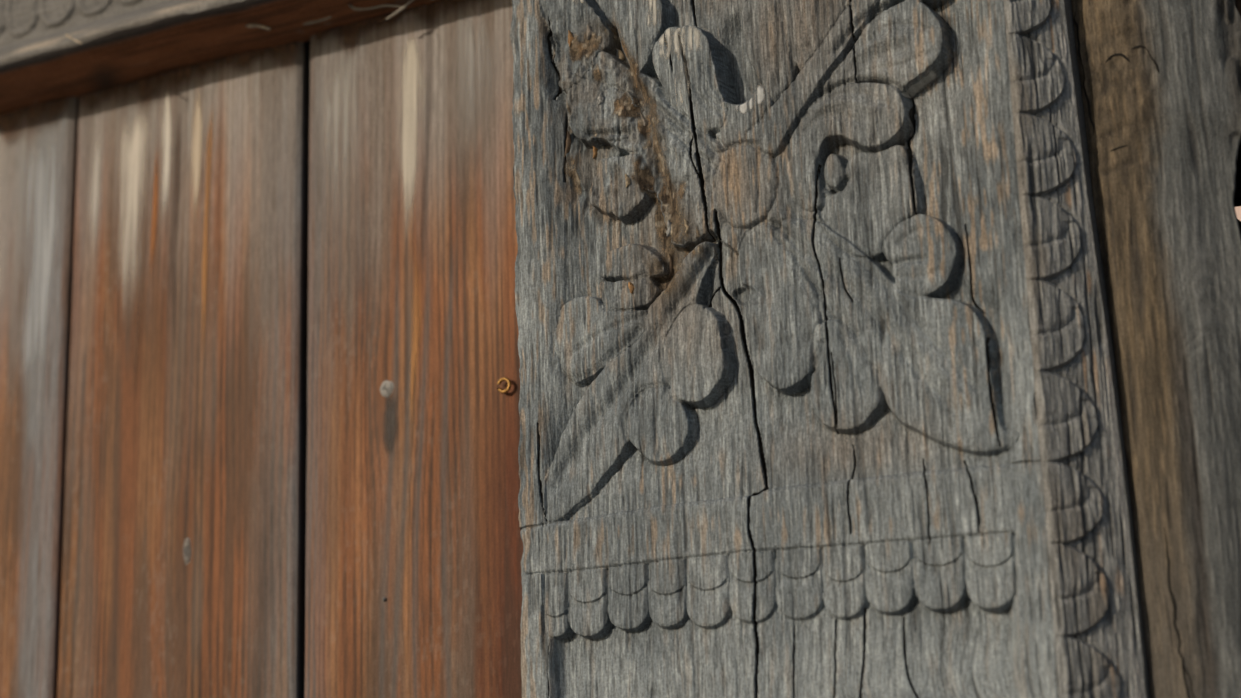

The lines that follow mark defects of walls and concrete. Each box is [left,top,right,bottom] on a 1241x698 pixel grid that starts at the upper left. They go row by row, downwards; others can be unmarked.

crack [850,0,858,83]
crack [904,86,917,215]
crack [664,0,769,698]
crack [812,164,856,534]
crack [790,630,798,698]
crack [834,606,866,698]
crack [904,617,919,698]